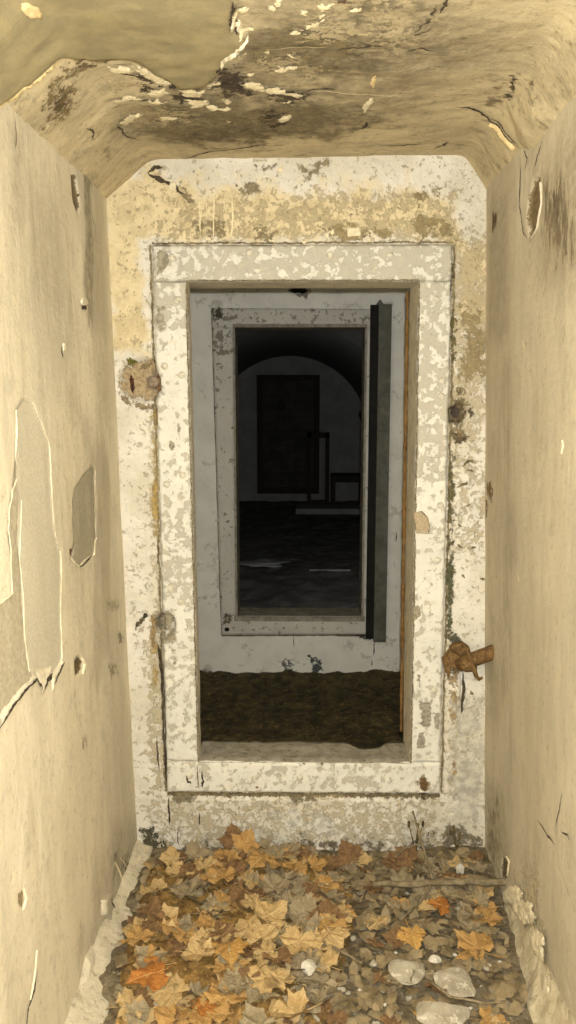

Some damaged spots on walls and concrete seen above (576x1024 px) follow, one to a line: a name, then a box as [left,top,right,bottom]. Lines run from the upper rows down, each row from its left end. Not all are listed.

leakage [41,60,109,131]
crack [86,121,140,141]
crack [147,143,269,194]
peeling [0,0,435,128]
leakage [180,182,260,241]
leakage [133,26,383,147]
crack [453,107,542,238]
spalling [526,179,542,240]
peeling [0,398,97,731]
peeling [414,511,430,534]
leakage [445,432,476,643]
crack [156,643,204,846]